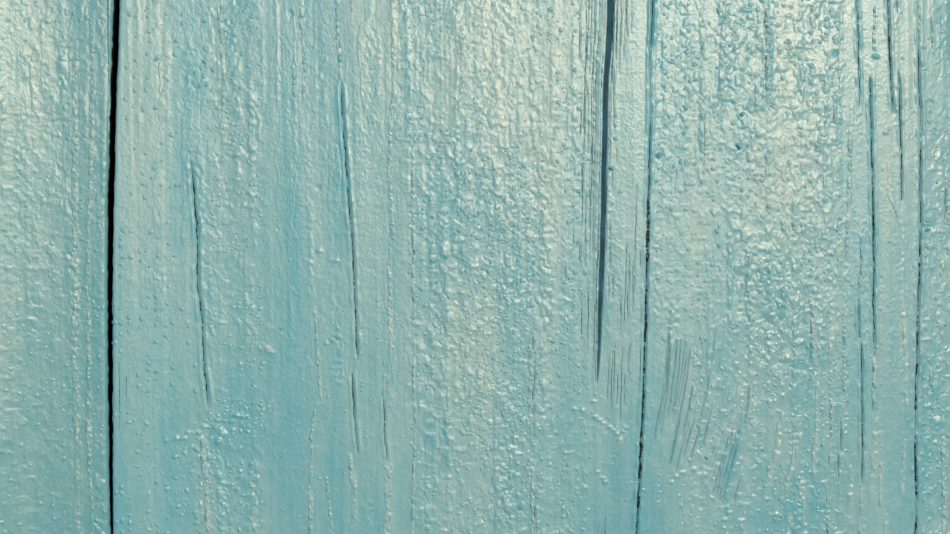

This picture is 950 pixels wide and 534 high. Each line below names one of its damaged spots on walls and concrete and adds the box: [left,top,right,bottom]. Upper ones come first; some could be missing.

crack [190,160,210,413]
crack [341,84,359,450]
crack [565,0,653,534]
crack [838,0,922,534]